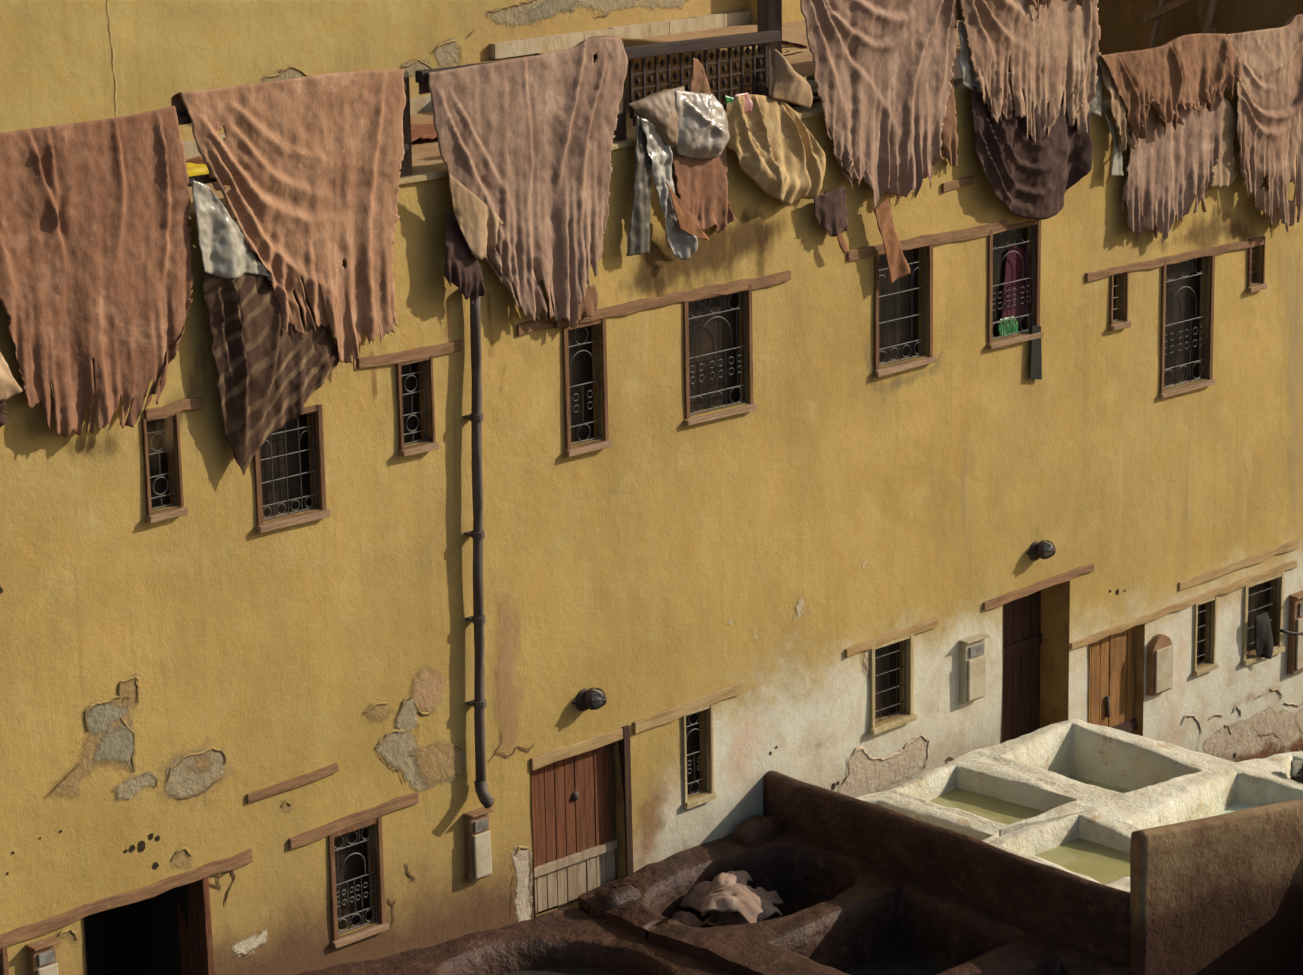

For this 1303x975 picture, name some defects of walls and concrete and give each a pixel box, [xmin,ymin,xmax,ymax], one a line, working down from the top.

flaking render [487,0,689,28]
crack [108,0,119,117]
flaking render [262,65,308,83]
flaking render [401,26,475,76]
peeling [48,676,227,801]
peeling [364,668,466,791]
flaking render [832,734,930,798]